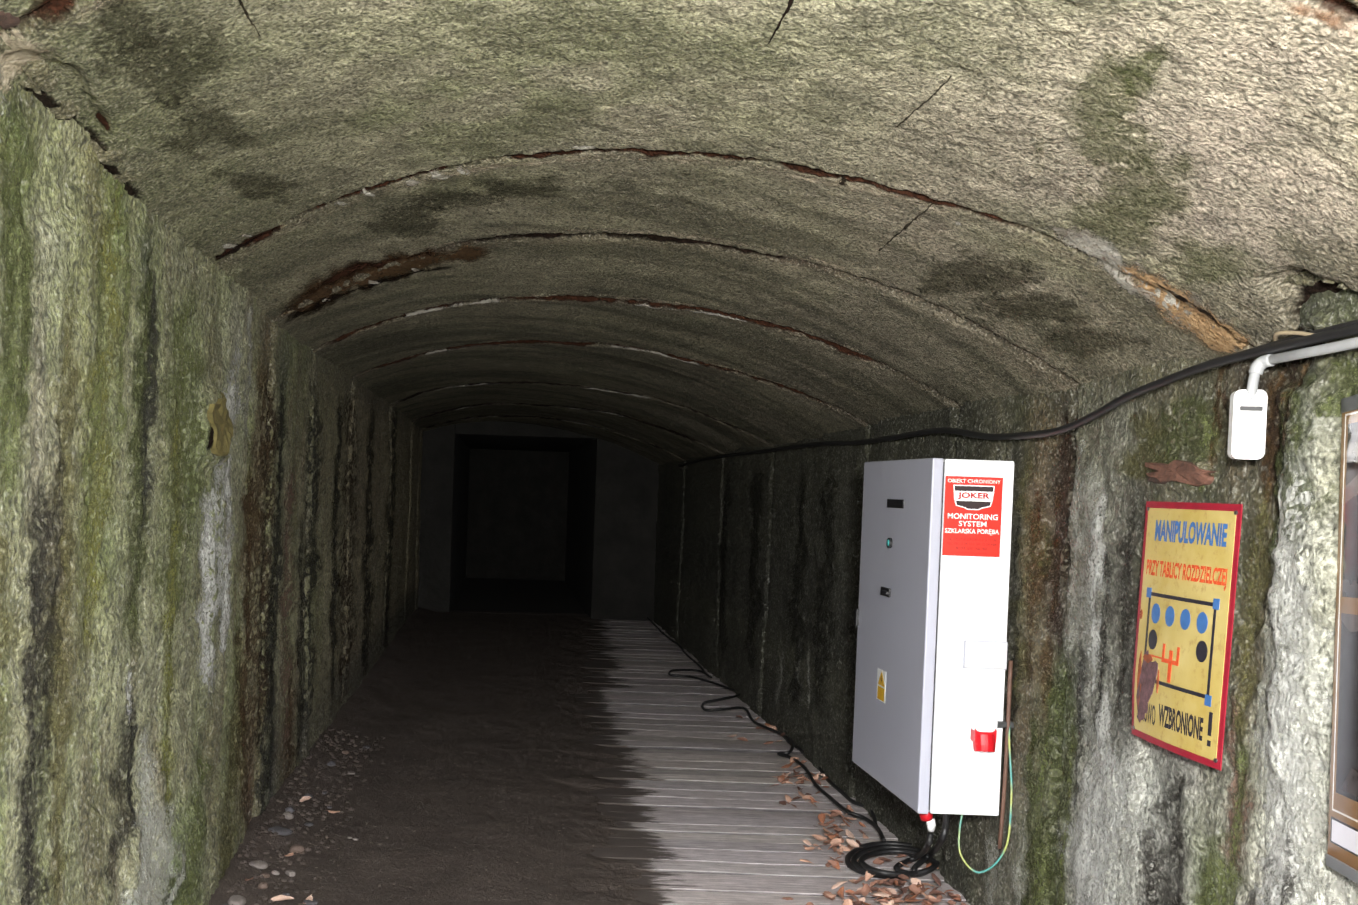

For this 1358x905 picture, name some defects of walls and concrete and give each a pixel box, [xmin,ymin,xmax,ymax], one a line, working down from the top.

crack [0,0,101,29]
crack [238,0,260,36]
crack [767,0,794,45]
crack [1296,0,1358,26]
crack [895,75,952,128]
crack [315,146,1014,252]
crack [428,229,845,270]
rust [283,243,490,321]
damp [18,431,65,905]